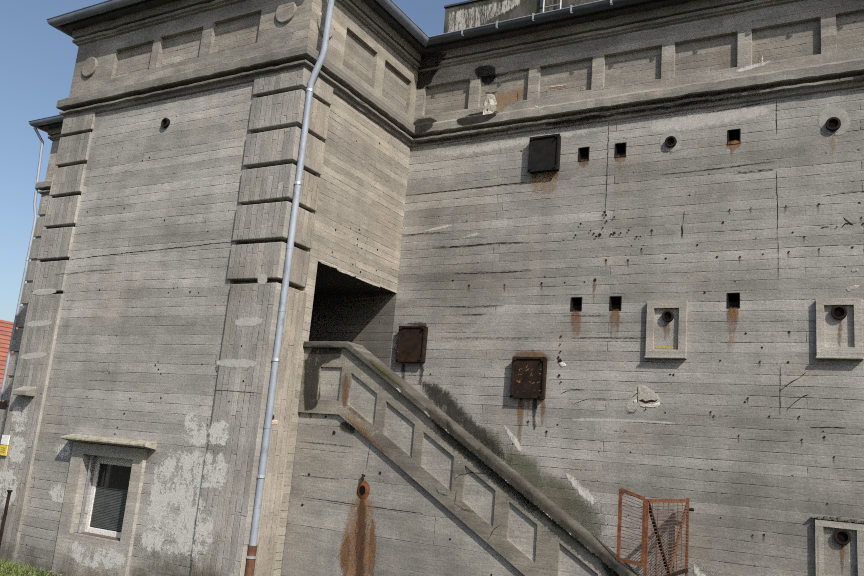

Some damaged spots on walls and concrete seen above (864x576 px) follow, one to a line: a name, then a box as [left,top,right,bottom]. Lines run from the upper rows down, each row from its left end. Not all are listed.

spalling [483,71,529,115]
damp [304,345,341,418]
corrosion [518,398,545,429]
spalling [625,384,661,413]
peeling [141,413,230,560]
corrosion [341,498,376,576]